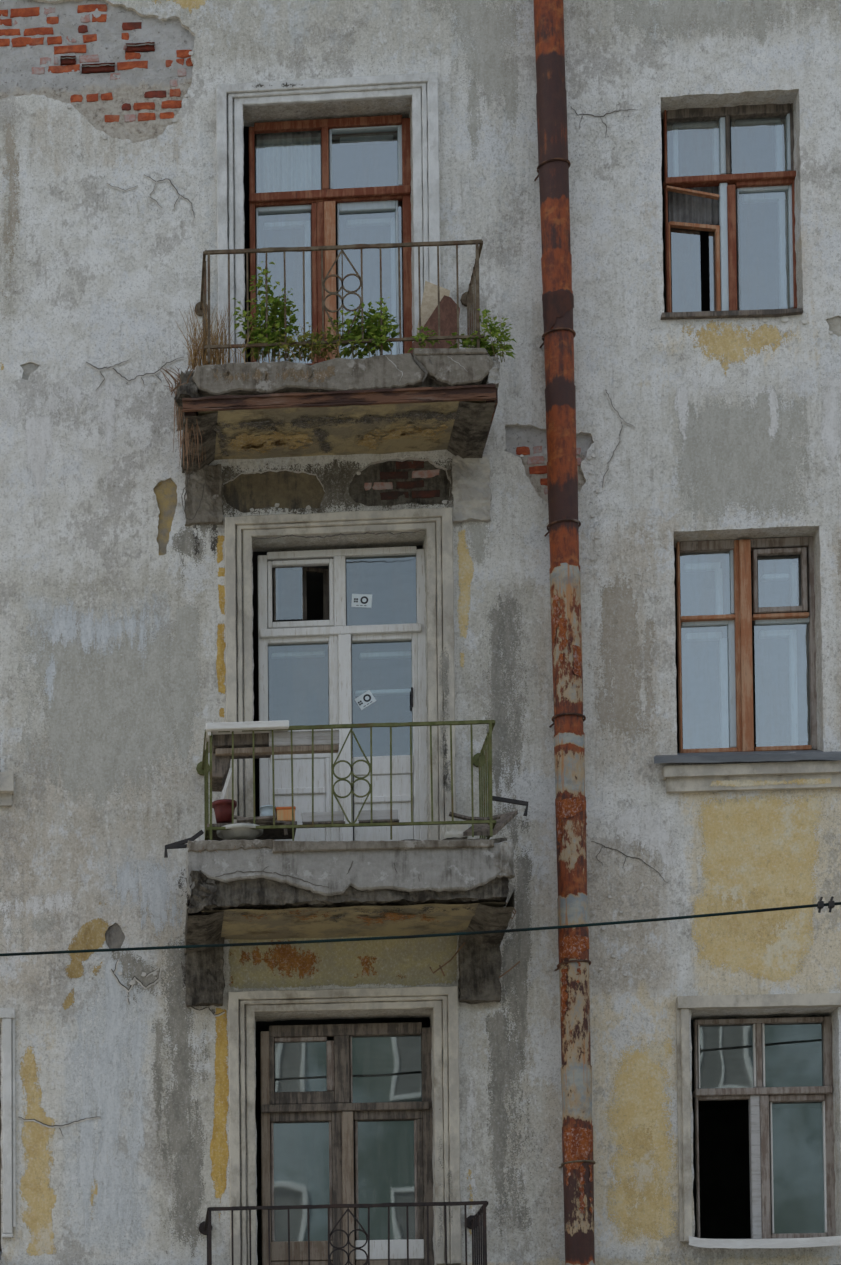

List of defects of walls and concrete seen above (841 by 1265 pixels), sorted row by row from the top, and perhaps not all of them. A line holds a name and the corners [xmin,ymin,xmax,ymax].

spalling [0,0,209,143]
crack [106,175,195,219]
rust [542,290,574,334]
crack [85,357,184,392]
spalling [153,478,180,555]
spalling [223,471,325,513]
spalling [348,460,450,506]
rust [552,595,582,676]
peeling [704,886,808,949]
rust [559,935,590,1028]
crack [18,1116,101,1137]
rust [563,1127,593,1214]